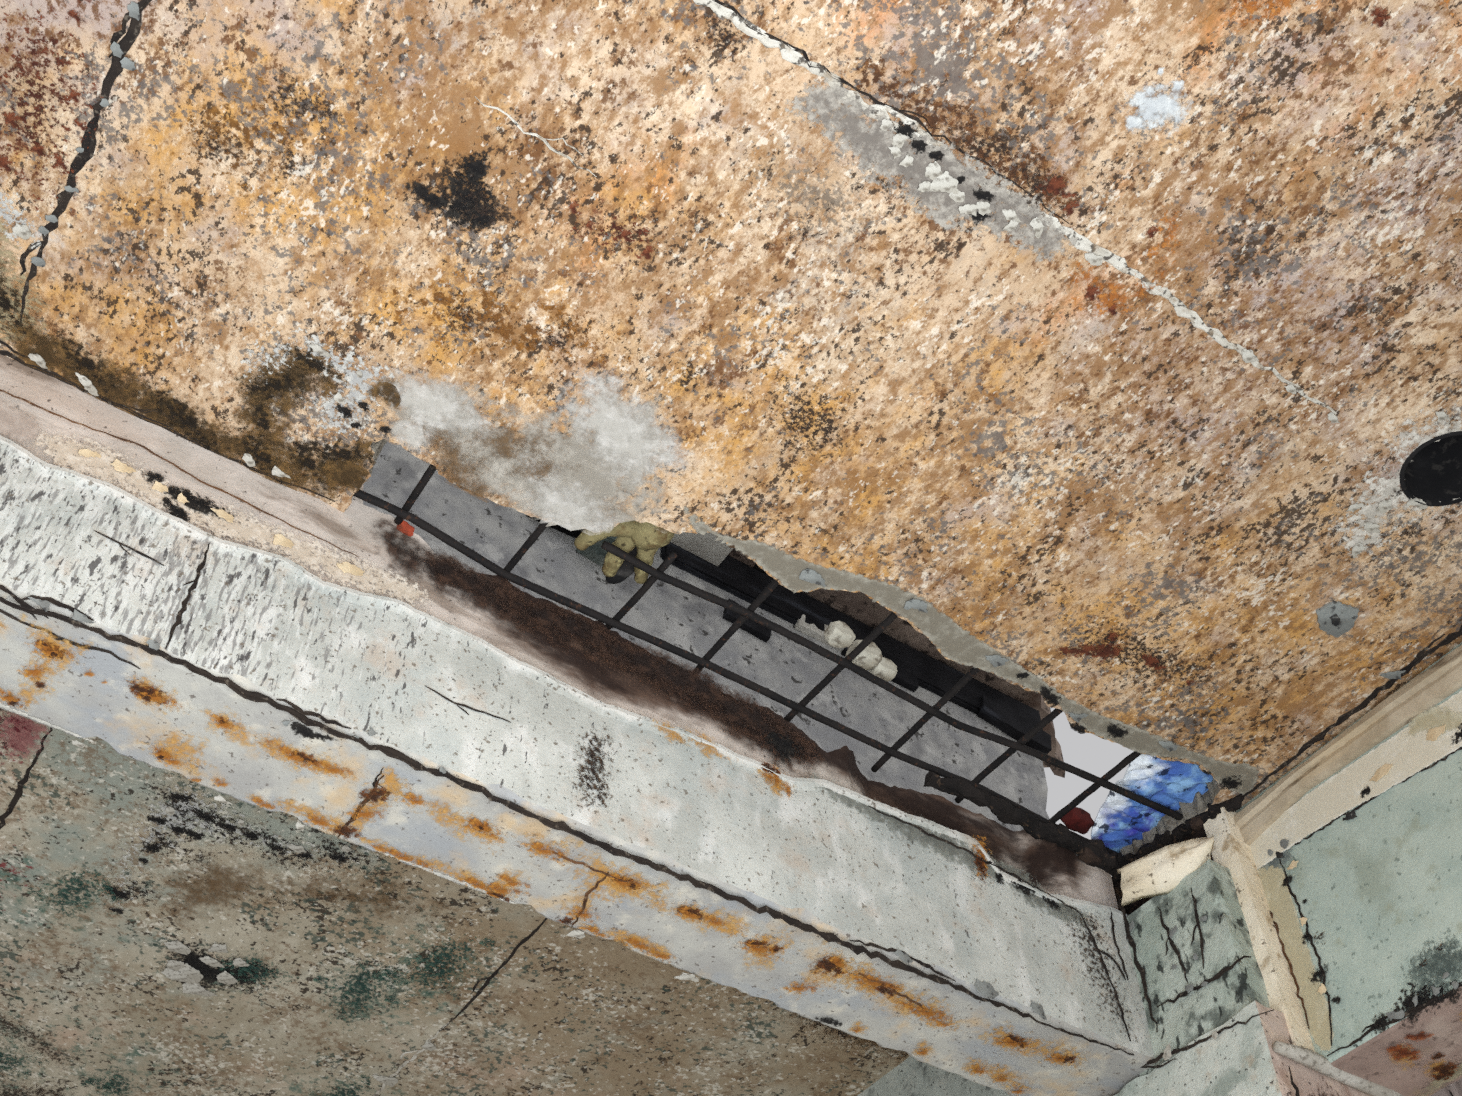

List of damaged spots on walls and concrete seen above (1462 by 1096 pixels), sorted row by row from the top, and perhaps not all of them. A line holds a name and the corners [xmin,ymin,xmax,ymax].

crack [0,0,358,557]
leakage [0,218,405,498]
crack [693,0,1340,423]
peeling [0,702,94,748]
rust [127,677,177,715]
rust [142,710,351,788]
rust [251,769,794,970]
crack [0,530,1274,1068]
spalling [353,464,1259,928]
rust [1056,615,1223,696]
crack [372,918,548,1096]
peeling [815,1017,842,1027]